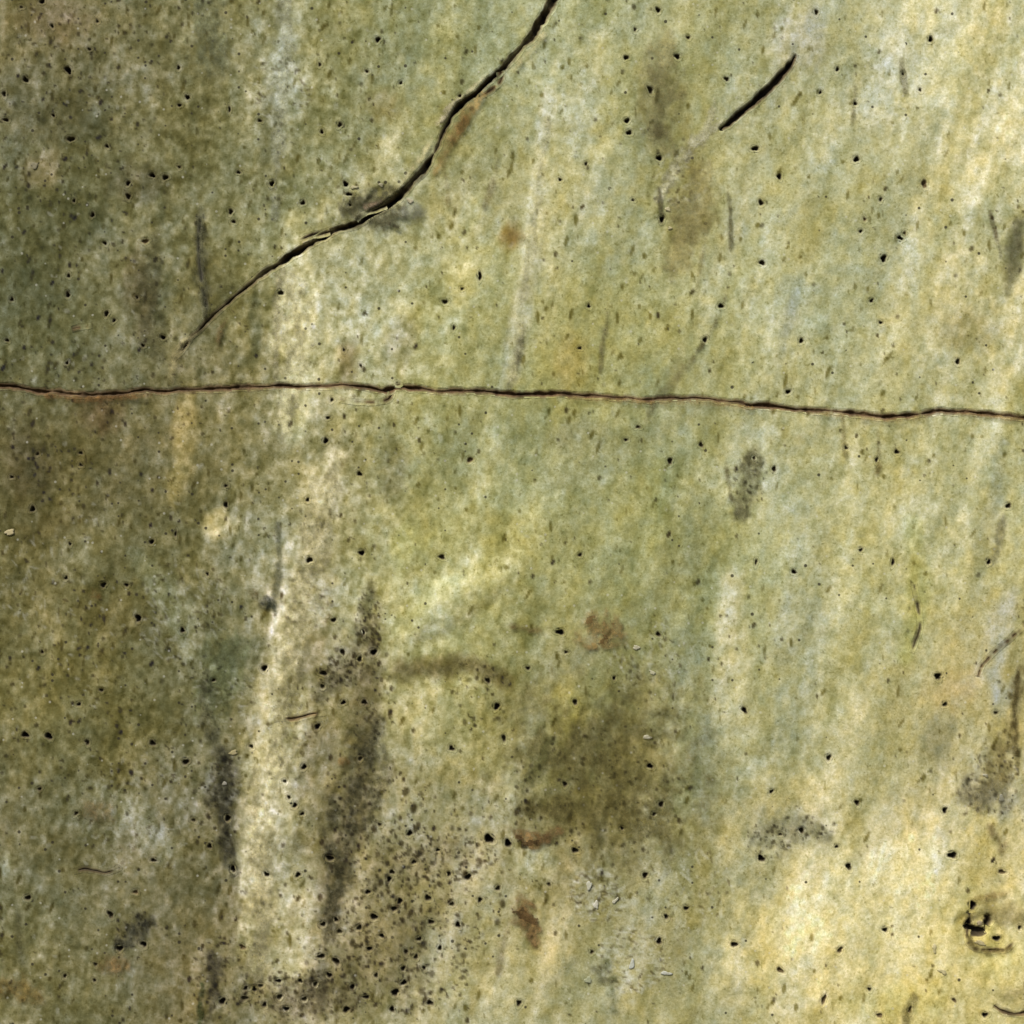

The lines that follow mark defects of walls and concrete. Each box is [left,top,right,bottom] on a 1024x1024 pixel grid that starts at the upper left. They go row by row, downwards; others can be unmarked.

crack [0,0,1024,422]
water stain [731,451,763,519]
rust [578,610,624,650]
water stain [323,717,381,942]
water stain [518,705,675,859]
rust [512,897,541,947]